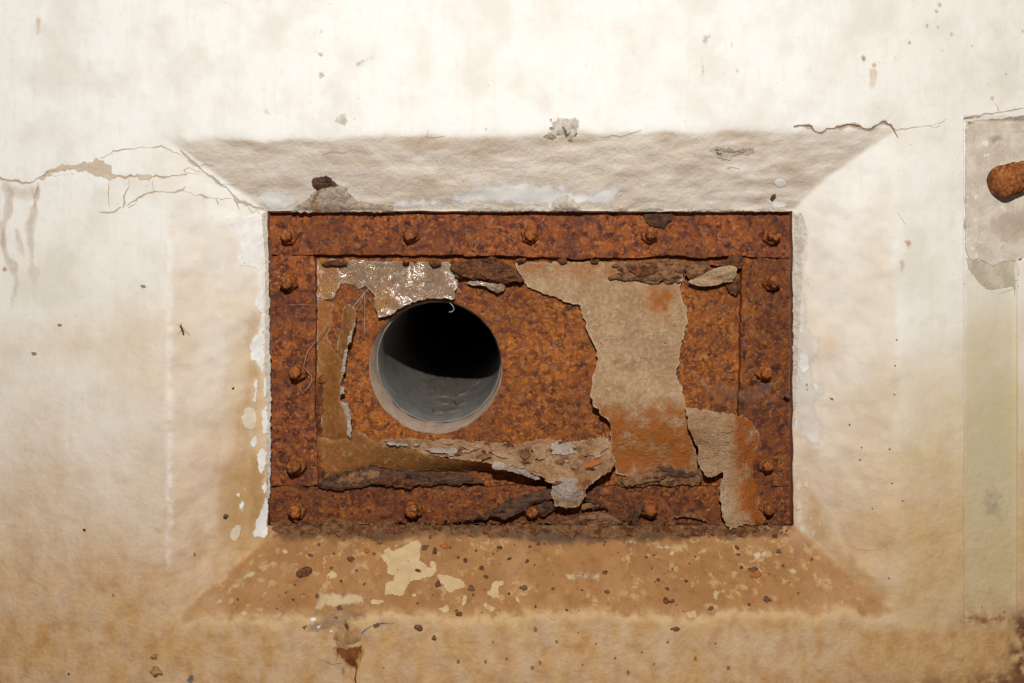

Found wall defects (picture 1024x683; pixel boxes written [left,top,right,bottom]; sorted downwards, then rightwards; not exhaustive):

crack [0,145,270,215]
spalling [291,176,395,213]
spalling [465,195,582,212]
flaking render [544,119,579,141]
flaking render [708,146,755,160]
crack [794,106,1021,137]
spalling [964,115,1024,297]
spalling [609,203,808,437]
peeling [223,212,272,541]
peeling [317,259,766,530]
rust [296,566,313,578]
peeling [315,540,467,613]